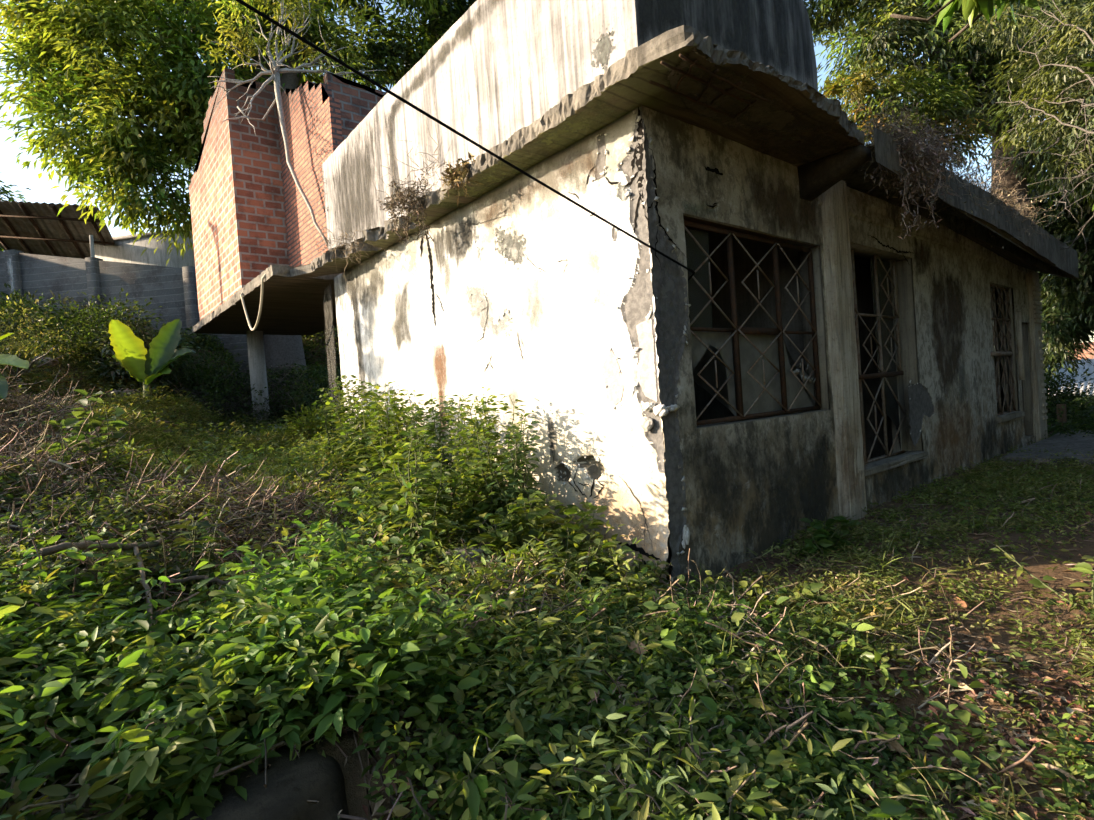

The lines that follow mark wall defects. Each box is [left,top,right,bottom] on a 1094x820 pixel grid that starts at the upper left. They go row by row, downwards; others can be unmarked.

leakage [332,0,499,247]
leakage [557,151,597,186]
leakage [434,181,544,290]
leakage [323,283,339,437]
leakage [346,268,383,402]
leakage [392,285,411,350]
corrosion [434,346,446,436]
flaking render [591,108,691,590]
leakage [914,237,965,397]
spalling [555,453,605,498]
leakage [684,436,829,531]